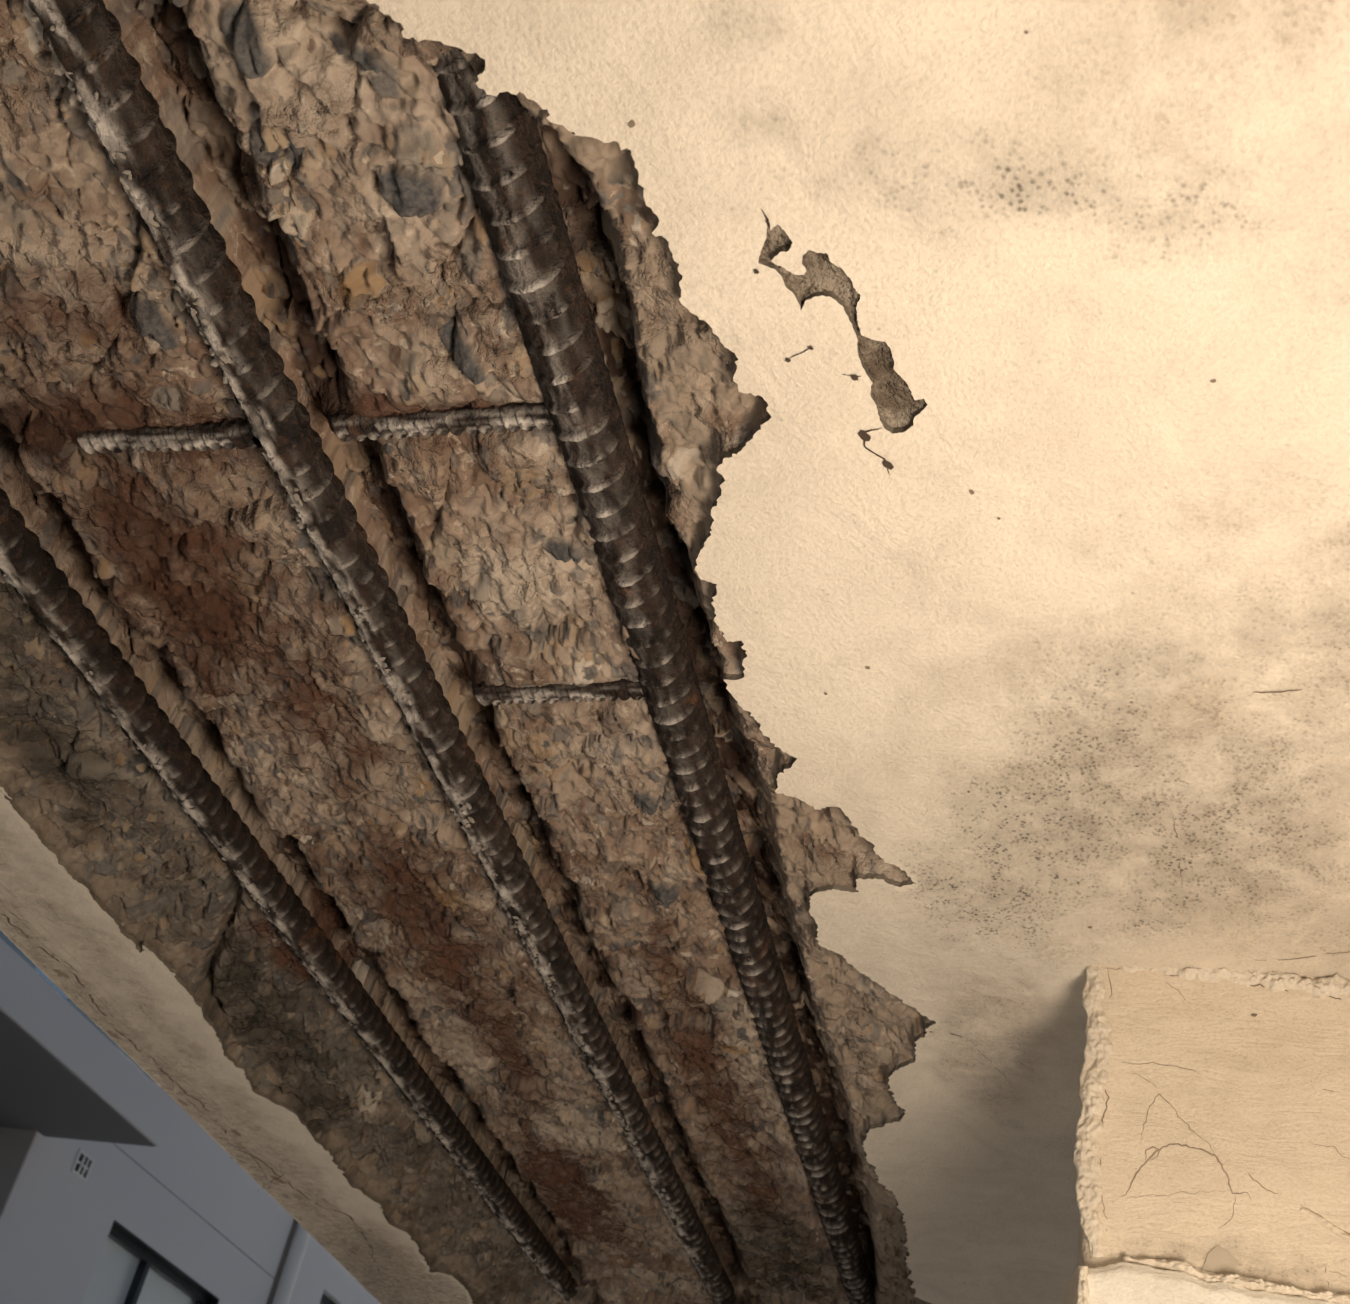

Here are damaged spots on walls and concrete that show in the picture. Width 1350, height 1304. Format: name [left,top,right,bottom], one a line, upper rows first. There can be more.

corrosion [85,453,256,657]
corrosion [279,661,358,745]
spalling [0,0,933,1304]
corrosion [306,881,345,940]
mould [972,732,1118,940]
damp [1150,786,1302,906]
corrosion [378,861,634,1252]
corrosion [665,1012,779,1216]
crack [1101,1062,1350,1235]